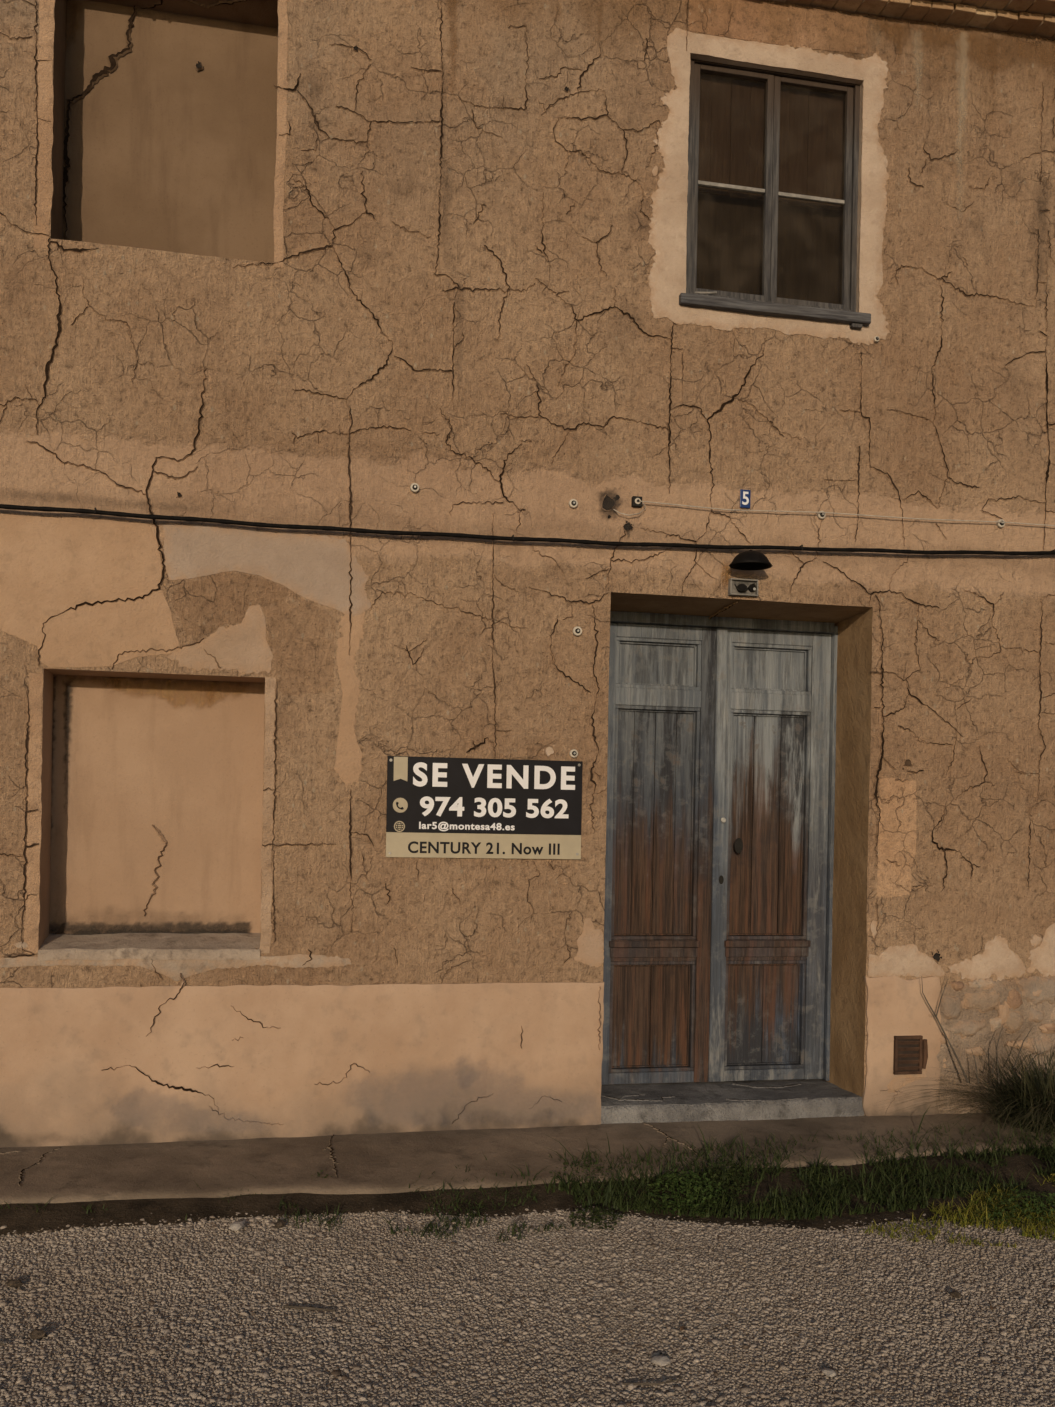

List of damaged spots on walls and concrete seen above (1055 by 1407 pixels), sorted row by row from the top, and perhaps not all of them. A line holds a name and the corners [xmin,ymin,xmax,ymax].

crack [0,0,250,958]
crack [233,0,801,833]
crack [789,81,1055,940]
spalling [171,572,336,697]
crack [256,682,419,950]
crack [526,862,554,923]
crack [315,1062,370,1085]
crack [452,1093,493,1124]
spalling [867,920,1055,1114]